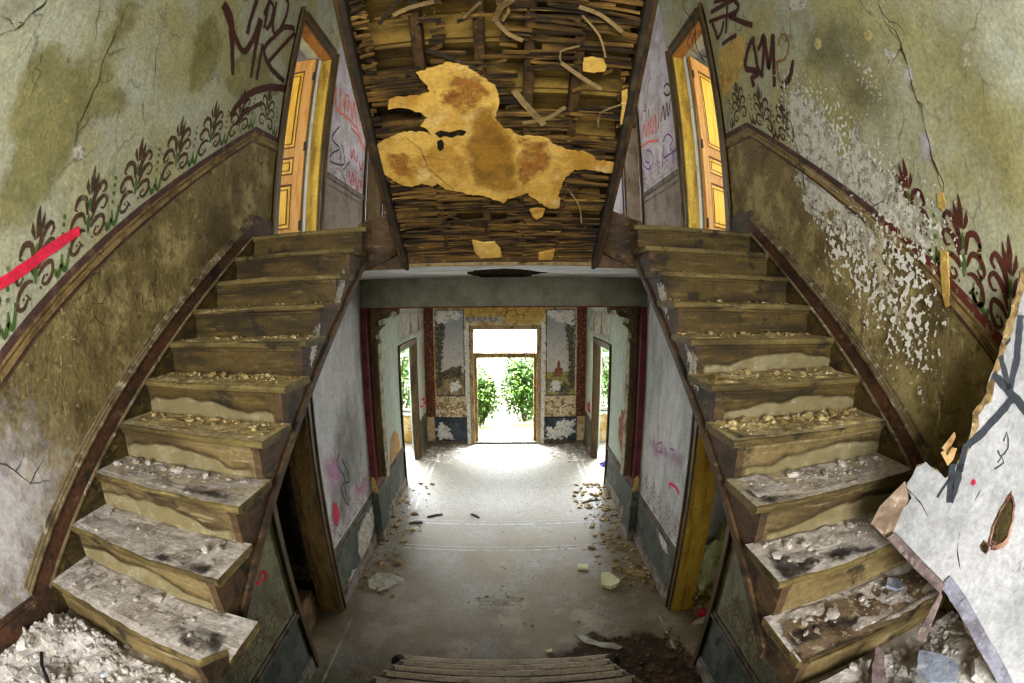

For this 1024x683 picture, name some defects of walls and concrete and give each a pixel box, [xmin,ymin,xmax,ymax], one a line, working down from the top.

crack [74,1,130,147]
spalling [435,130,466,151]
peeling [775,67,966,403]
crack [878,0,963,437]